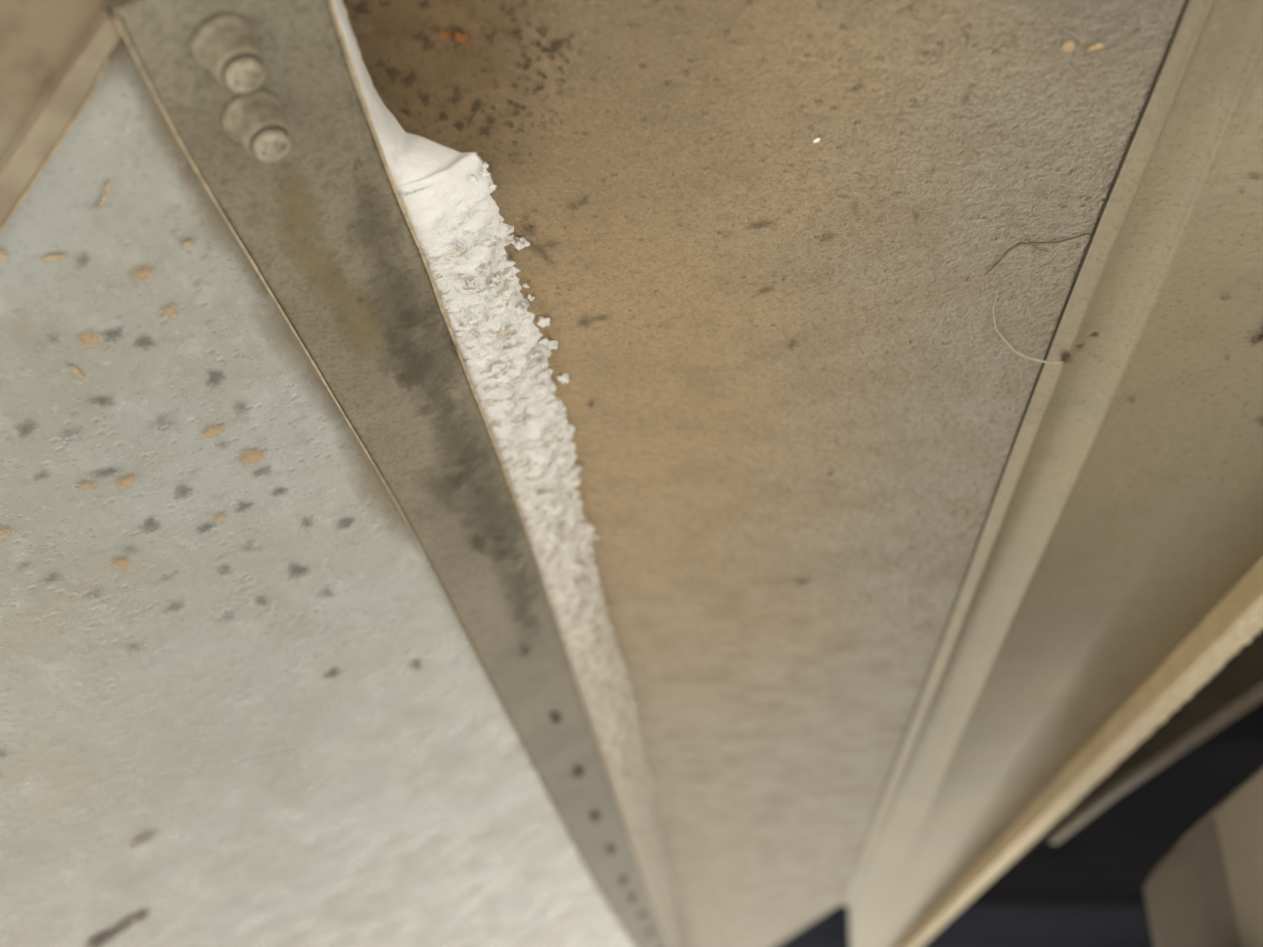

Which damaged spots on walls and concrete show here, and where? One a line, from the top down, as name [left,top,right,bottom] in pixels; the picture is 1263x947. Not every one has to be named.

spalling [332,0,684,947]